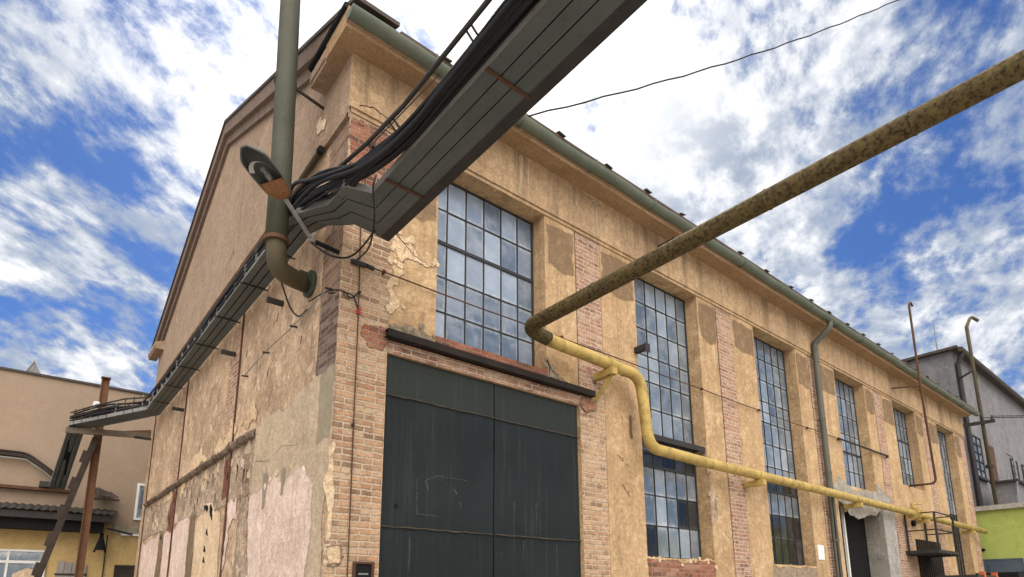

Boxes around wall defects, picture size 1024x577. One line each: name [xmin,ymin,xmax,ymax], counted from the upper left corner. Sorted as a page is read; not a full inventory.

peeling [360,231,440,351]
peeling [139,404,344,577]
spalling [646,556,718,577]